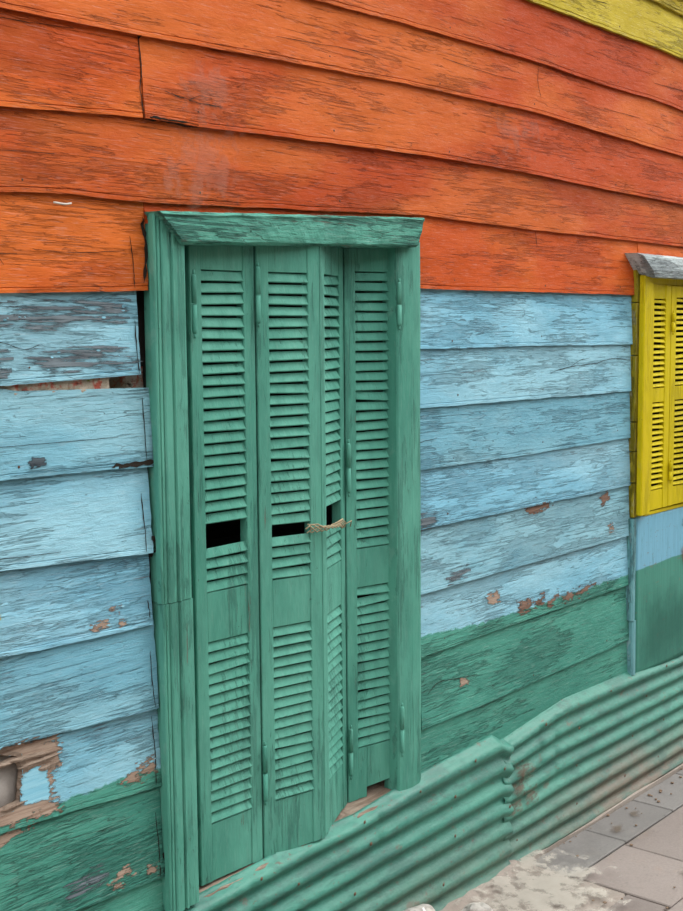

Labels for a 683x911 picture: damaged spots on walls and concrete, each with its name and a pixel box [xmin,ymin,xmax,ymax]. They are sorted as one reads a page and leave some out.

peeling [0,295,131,332]
peeling [0,345,143,395]
peeling [517,581,597,616]
peeling [89,603,129,632]
peeling [118,754,158,787]
peeling [0,733,67,851]
peeling [63,860,161,903]